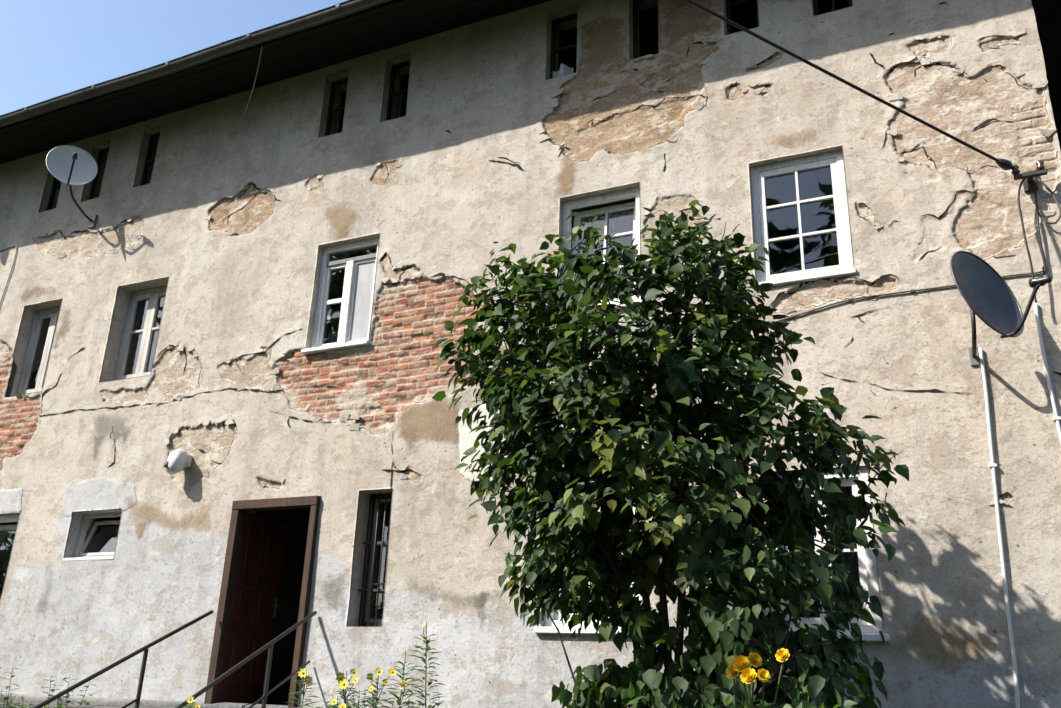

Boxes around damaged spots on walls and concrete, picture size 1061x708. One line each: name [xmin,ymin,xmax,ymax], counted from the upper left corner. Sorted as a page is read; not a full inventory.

spalling [536,0,723,161]
crack [869,0,1036,89]
spalling [883,35,1061,260]
crack [972,118,1015,132]
spalling [32,215,144,260]
spalling [205,179,275,236]
spalling [642,194,715,256]
flaking render [0,341,43,471]
crack [21,325,330,467]
flaking render [217,253,491,436]
crack [813,370,960,395]
spalling [165,418,236,488]